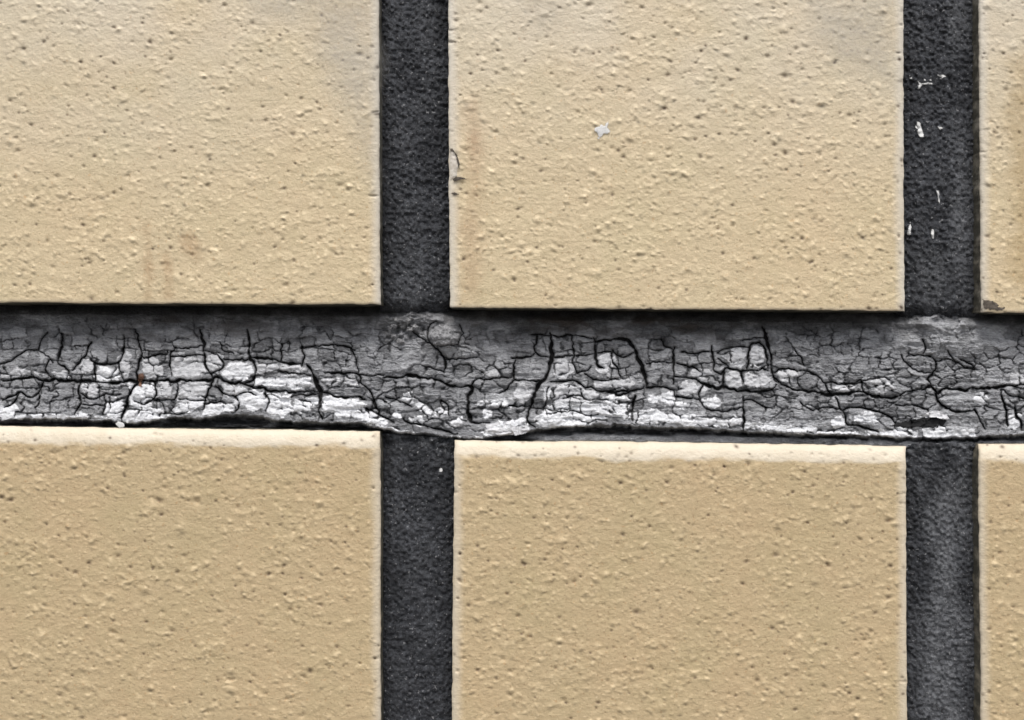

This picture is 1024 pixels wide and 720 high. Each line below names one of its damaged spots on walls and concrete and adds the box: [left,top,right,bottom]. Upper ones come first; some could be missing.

spalling [385,317,422,344]
crack [0,305,1024,448]
peeling [486,420,529,435]
spalling [890,411,949,428]